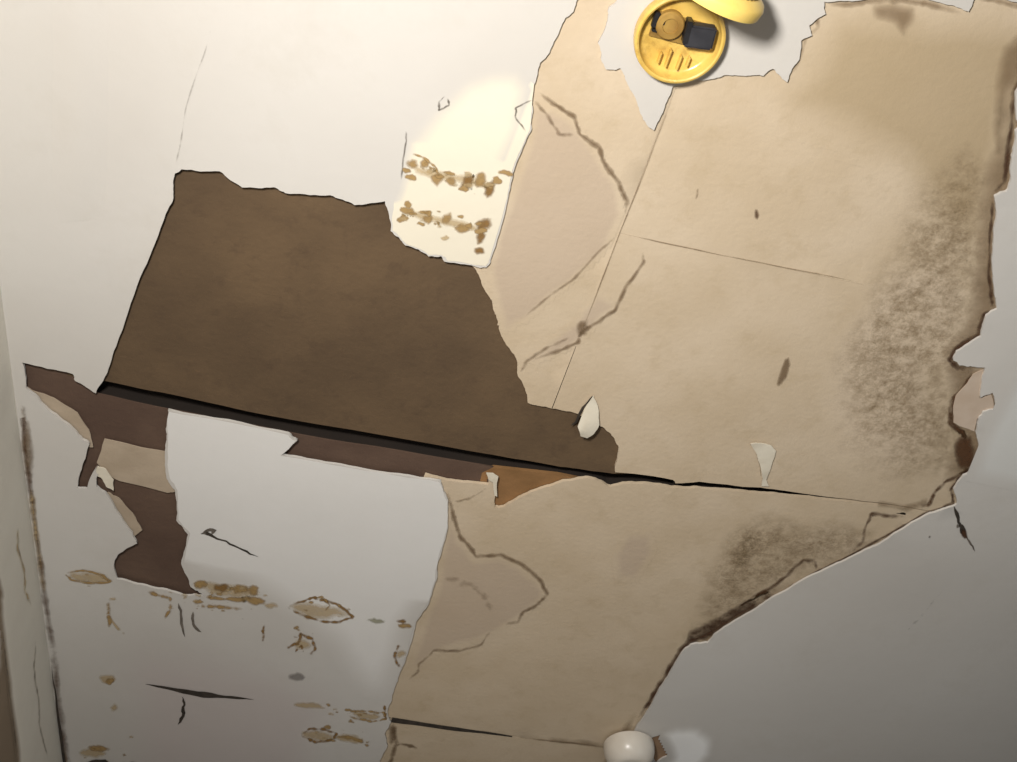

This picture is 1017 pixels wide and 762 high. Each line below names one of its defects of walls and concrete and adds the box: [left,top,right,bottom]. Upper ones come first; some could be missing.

water stain [746,0,1017,573]
peeling [96,466,114,491]
crack [97,381,852,500]
peeling [380,0,996,762]
crack [954,507,975,551]
water stain [645,541,820,708]